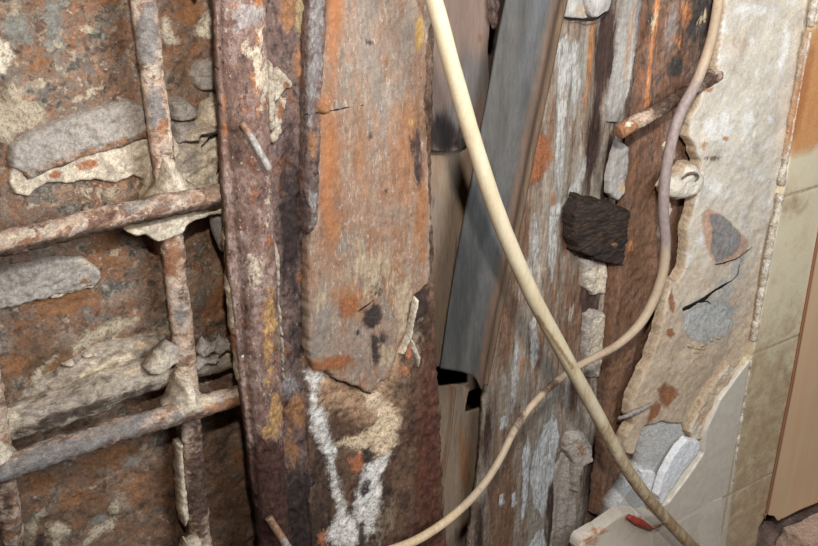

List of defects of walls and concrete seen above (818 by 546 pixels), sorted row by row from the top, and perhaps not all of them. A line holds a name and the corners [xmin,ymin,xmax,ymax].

spalling [564,0,642,122]
spalling [5,98,151,196]
corrosion [530,135,554,185]
peeling [124,205,222,242]
corrosion [301,0,431,429]
spalling [0,255,101,308]
crack [682,247,752,311]
peeling [141,338,178,375]
corrosion [648,384,678,423]
peeling [172,437,189,526]
water stain [305,368,401,546]
spalling [639,435,700,504]